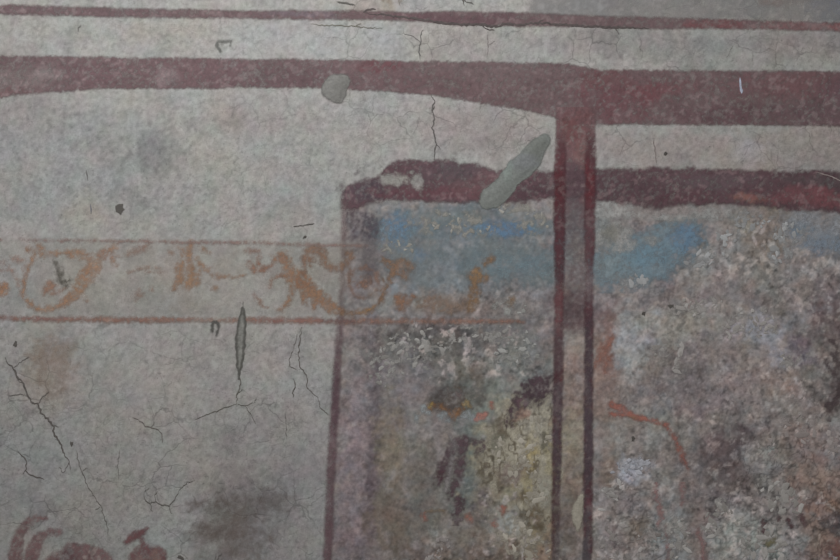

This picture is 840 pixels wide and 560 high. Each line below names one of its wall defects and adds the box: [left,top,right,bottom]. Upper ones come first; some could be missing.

crack [316,0,649,56]
crack [431,94,440,158]
spalling [235,306,247,380]
crack [197,377,257,424]
crack [285,327,326,436]
crack [5,357,108,534]
crack [144,480,195,512]